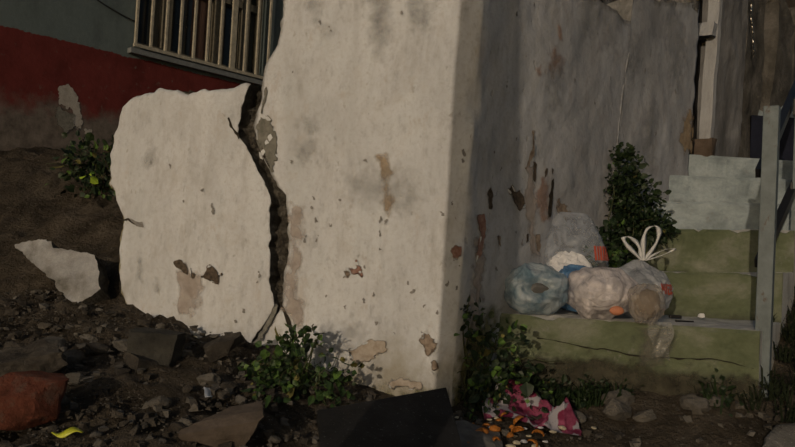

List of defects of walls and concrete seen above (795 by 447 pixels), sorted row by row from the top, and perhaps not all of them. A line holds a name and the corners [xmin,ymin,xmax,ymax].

peeling [55,84,92,134]
peeling [256,87,278,172]
peeling [508,130,541,255]
crack [228,91,305,359]
peeling [476,188,493,262]
spalling [173,259,222,317]
spalling [343,259,366,278]
spalling [349,339,388,364]
spalling [419,331,439,375]